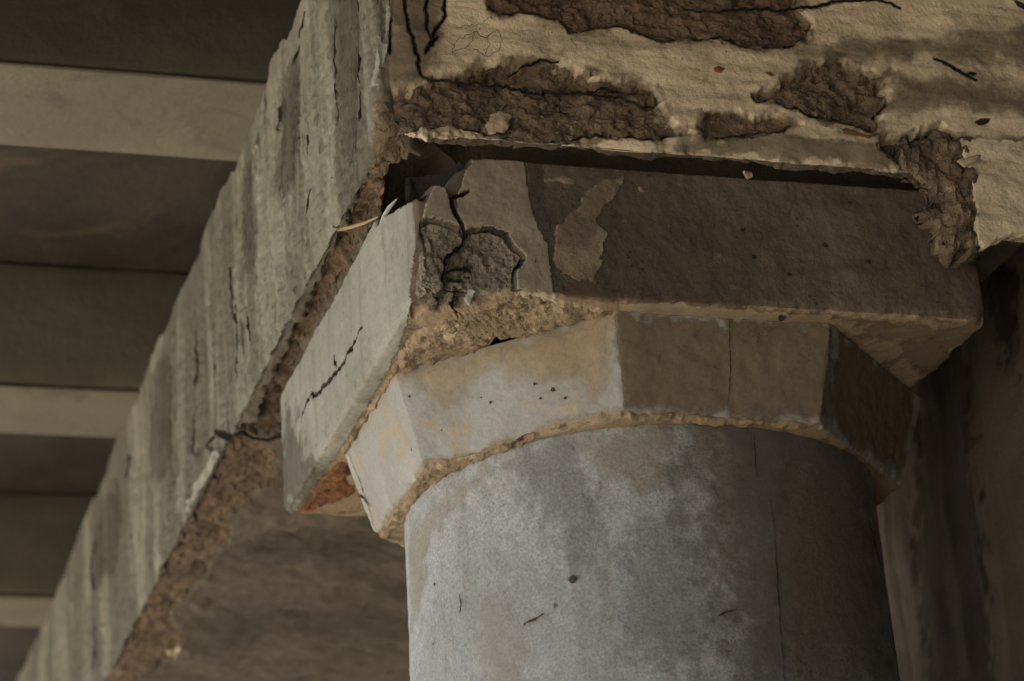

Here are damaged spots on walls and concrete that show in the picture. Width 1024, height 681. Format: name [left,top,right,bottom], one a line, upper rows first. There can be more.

crack [276,11,305,131]
crack [333,0,362,121]
crack [389,0,654,109]
spalling [489,0,810,48]
spalling [701,113,789,138]
spalling [752,63,886,131]
crack [934,58,977,81]
crack [433,191,470,313]
spalling [884,118,990,270]
crack [191,267,363,454]
spalling [106,64,675,681]
corrosion [298,290,833,513]